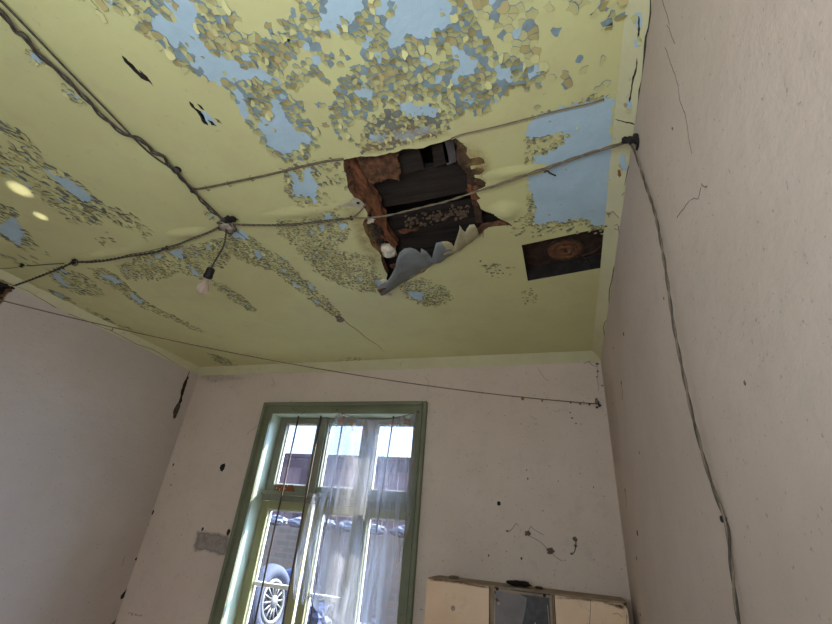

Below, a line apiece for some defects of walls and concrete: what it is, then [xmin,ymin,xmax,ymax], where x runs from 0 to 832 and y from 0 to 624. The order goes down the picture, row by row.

peeling [25,48,50,68]
peeling [0,120,345,333]
peeling [79,0,589,293]
peeling [399,278,454,308]
peeling [507,80,632,238]
peeling [566,0,643,47]
crack [616,0,692,154]